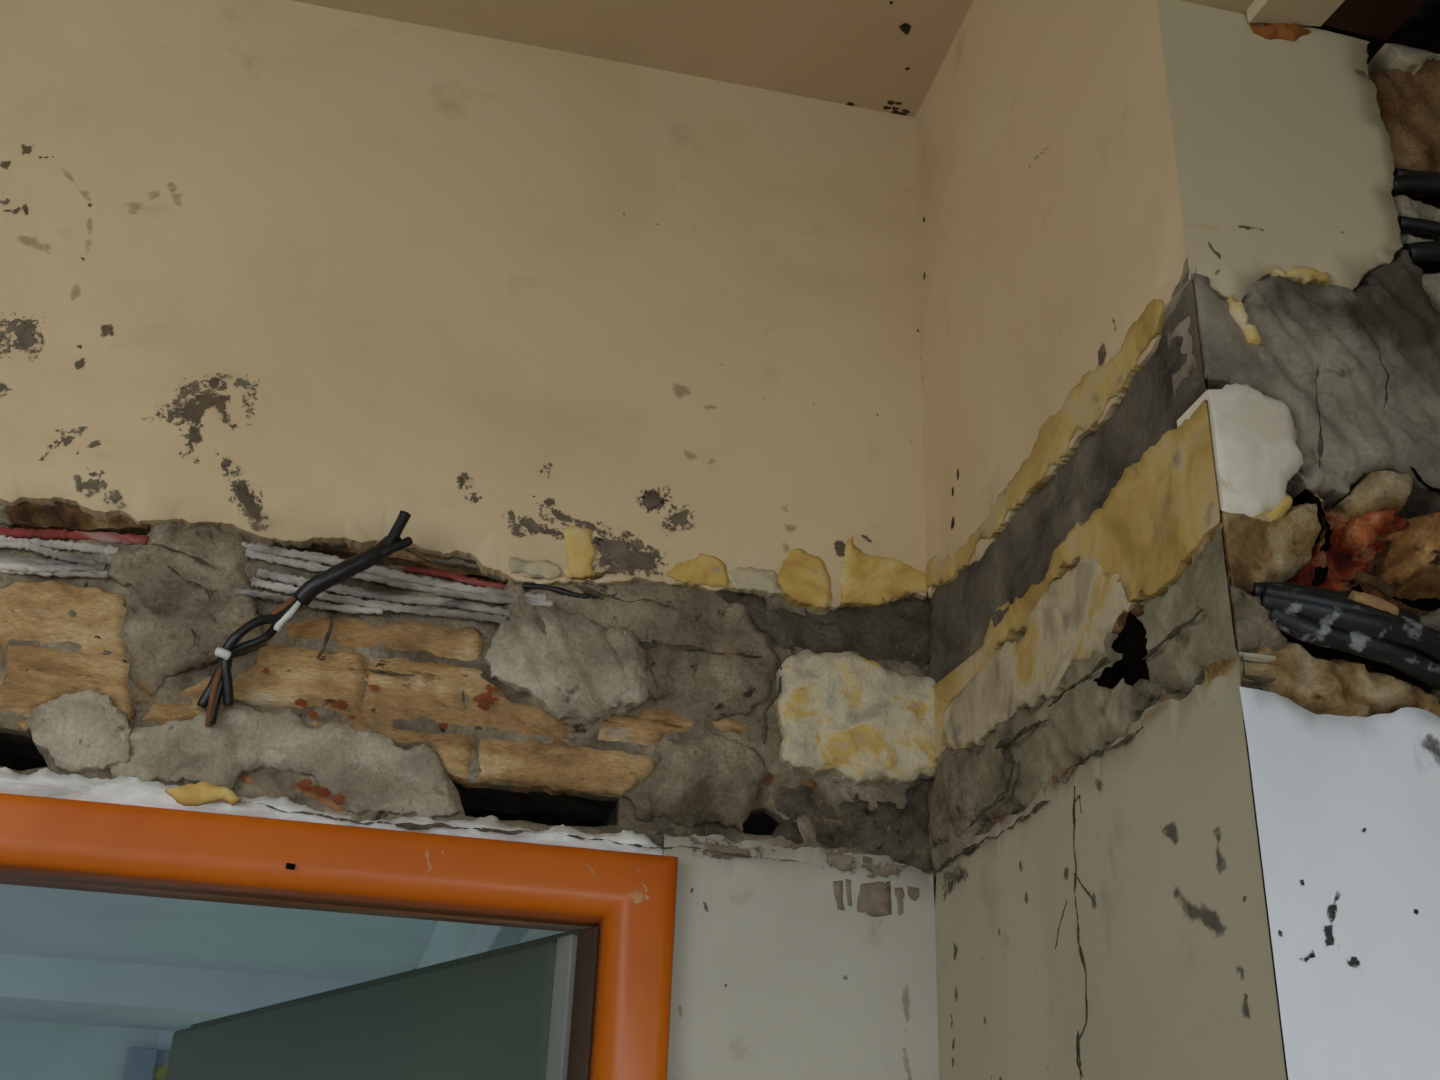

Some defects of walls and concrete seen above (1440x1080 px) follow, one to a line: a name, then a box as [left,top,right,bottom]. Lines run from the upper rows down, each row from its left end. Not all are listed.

flaking render [1367,43,1440,173]
flaking render [1392,193,1440,209]
peeling [1270,266,1332,286]
flaking render [1417,262,1440,274]
flaking render [0,295,1440,917]
crack [1142,609,1204,660]
crack [935,657,1144,1079]